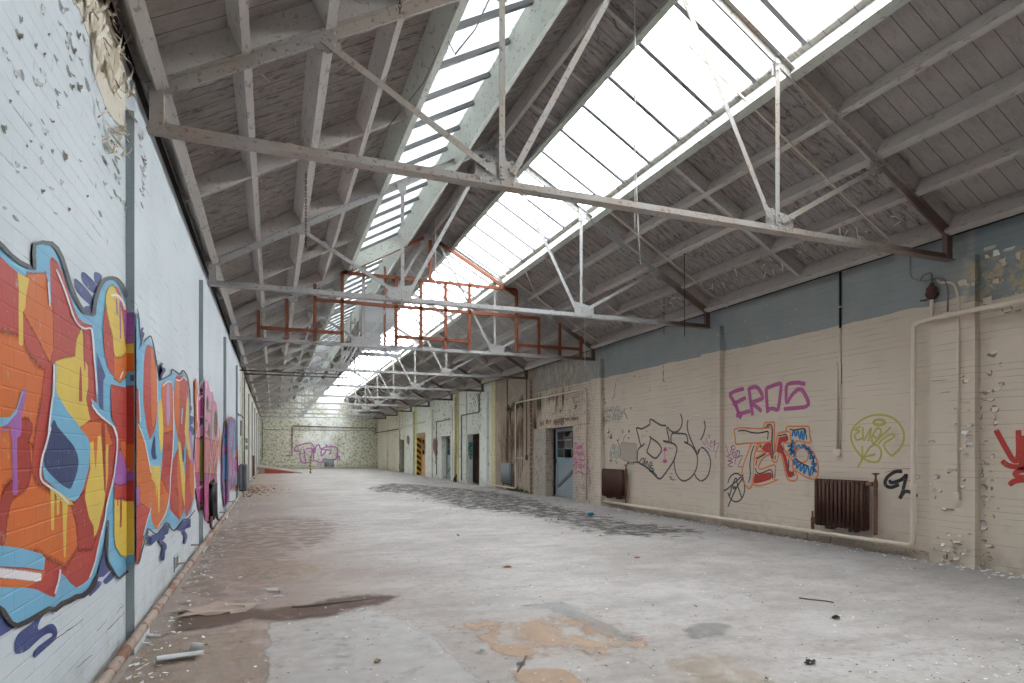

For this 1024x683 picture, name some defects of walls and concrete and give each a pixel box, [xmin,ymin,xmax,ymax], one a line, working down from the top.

peeling [2,0,147,209]
peeling [982,244,1024,313]
peeling [930,350,1005,566]
leakage [173,594,394,631]